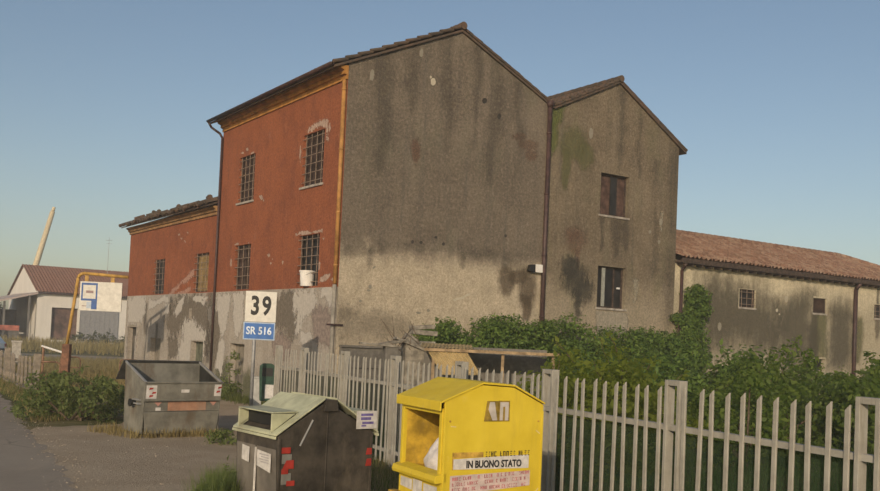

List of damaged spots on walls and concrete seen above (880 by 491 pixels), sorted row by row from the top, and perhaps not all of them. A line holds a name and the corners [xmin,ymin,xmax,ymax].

peeling [308,119,331,140]
spalling [127,269,245,386]
peeling [272,262,333,361]
damp [500,267,535,321]
damp [562,255,593,316]
damp [705,276,862,367]